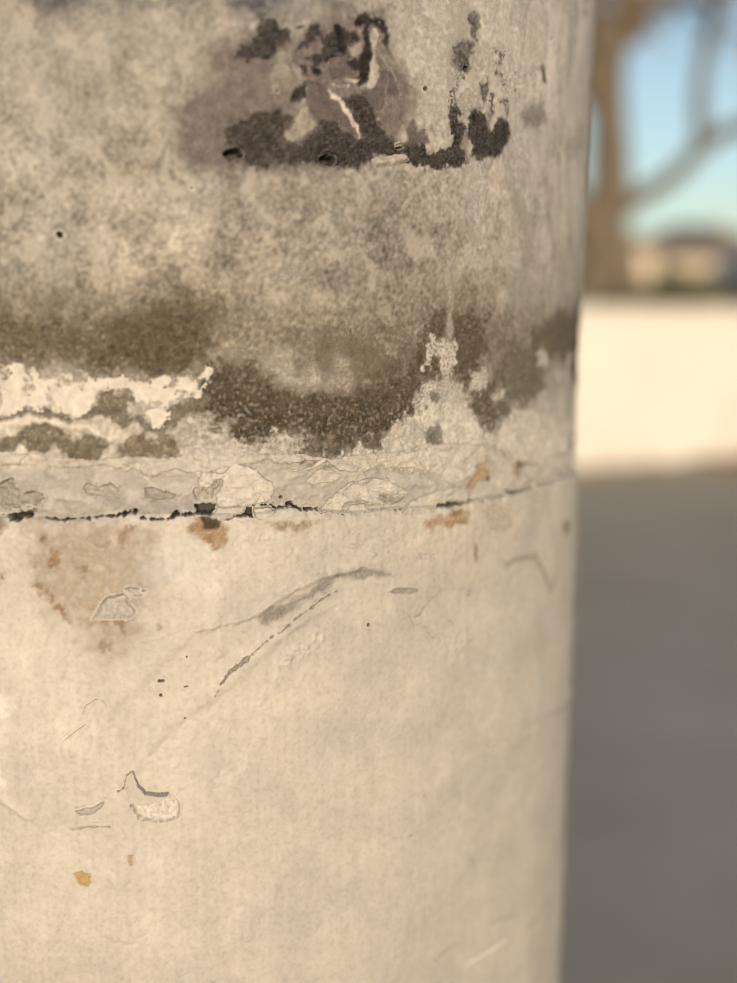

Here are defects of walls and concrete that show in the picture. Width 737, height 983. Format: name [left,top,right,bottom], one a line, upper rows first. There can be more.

water stain [181,0,548,303]
water stain [0,256,580,475]
crack [0,443,573,526]
peeling [0,424,574,521]
corrosion [188,517,227,550]
spalling [87,583,151,623]
spalling [69,770,183,833]